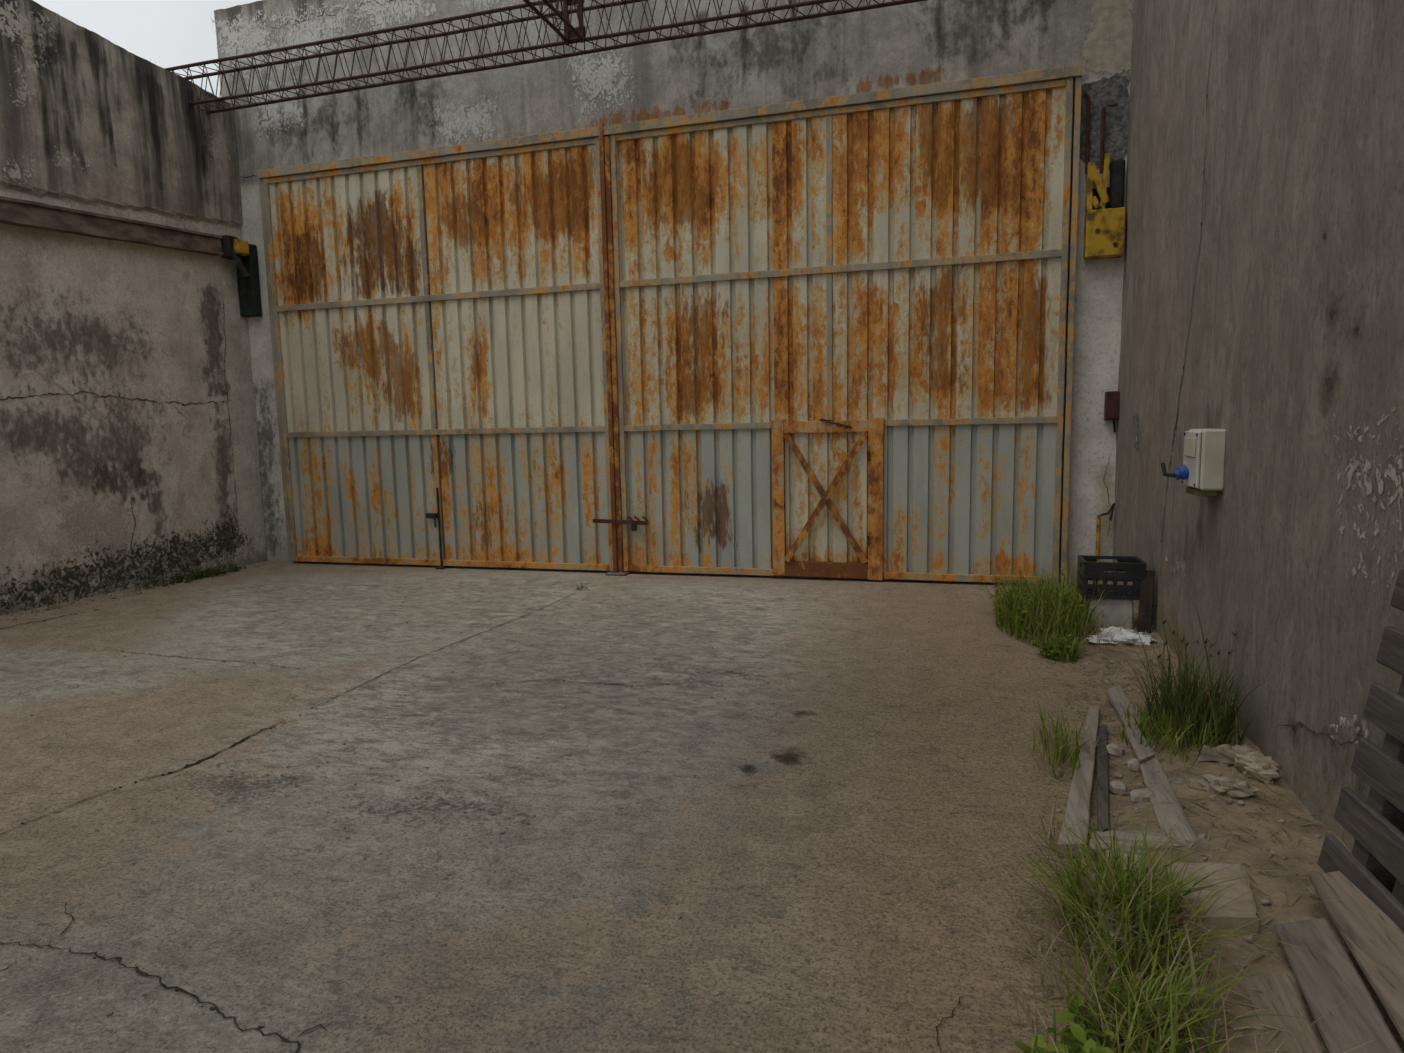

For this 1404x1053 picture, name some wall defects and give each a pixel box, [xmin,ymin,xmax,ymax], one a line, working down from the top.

leakage [34,26,75,66]
corrosion [915,92,1023,211]
corrosion [287,190,421,305]
leakage [4,314,142,375]
leakage [2,400,164,533]
crack [0,264,239,532]
leakage [201,287,235,552]
corrosion [333,316,419,419]
corrosion [917,269,965,398]
crack [1,587,588,834]
crack [0,900,327,1053]
crack [936,994,968,1052]